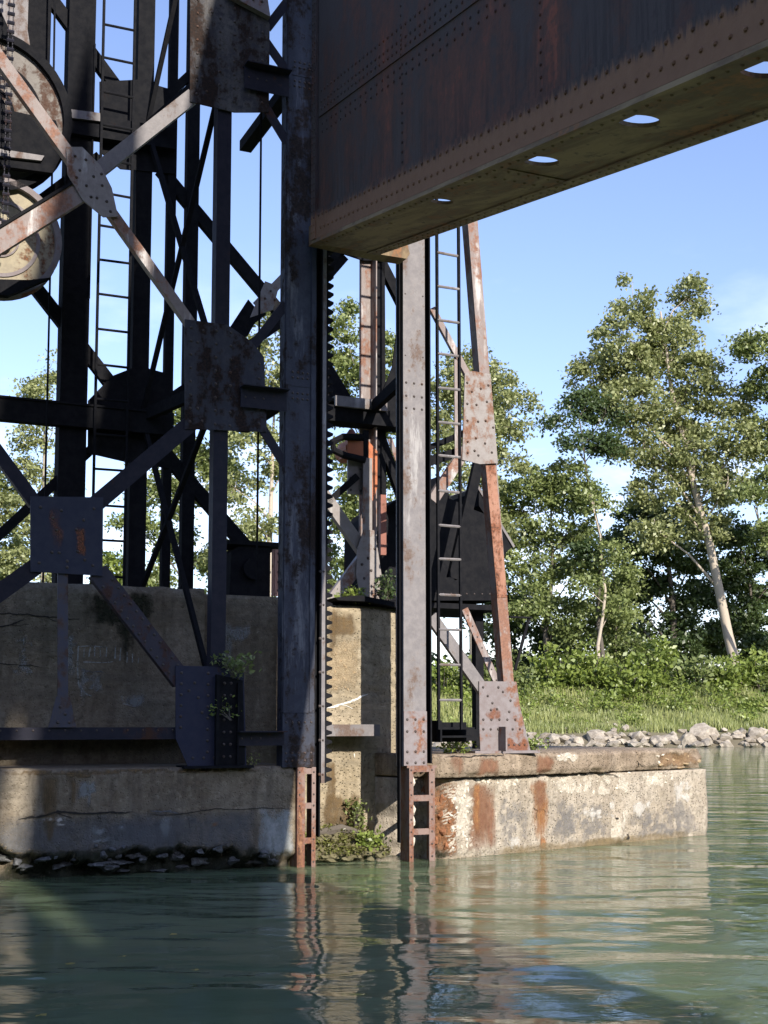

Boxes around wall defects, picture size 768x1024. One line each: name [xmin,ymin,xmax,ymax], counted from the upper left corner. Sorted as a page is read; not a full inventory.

rust [507,738,528,750]
crack [21,807,288,827]
rust [470,759,497,846]
rust [534,756,553,848]